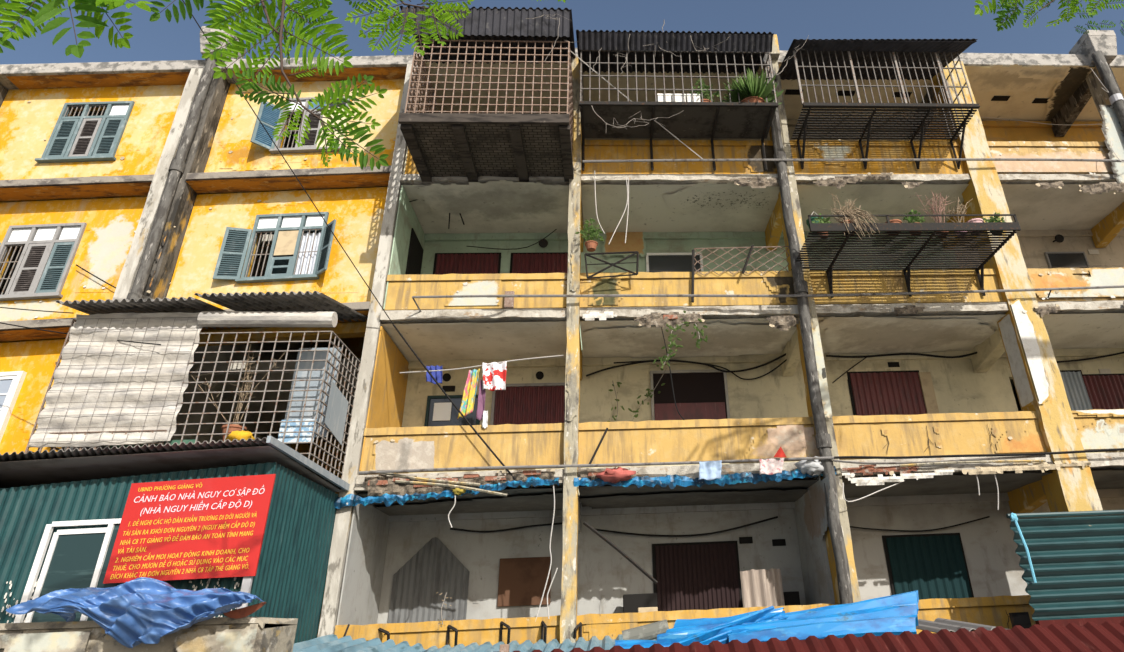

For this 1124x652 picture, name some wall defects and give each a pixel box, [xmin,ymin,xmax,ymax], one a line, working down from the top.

peeling [0,213,141,322]
peeling [445,280,501,306]
peeling [1023,269,1124,317]
peeling [842,419,1124,486]
spalling [364,469,555,496]